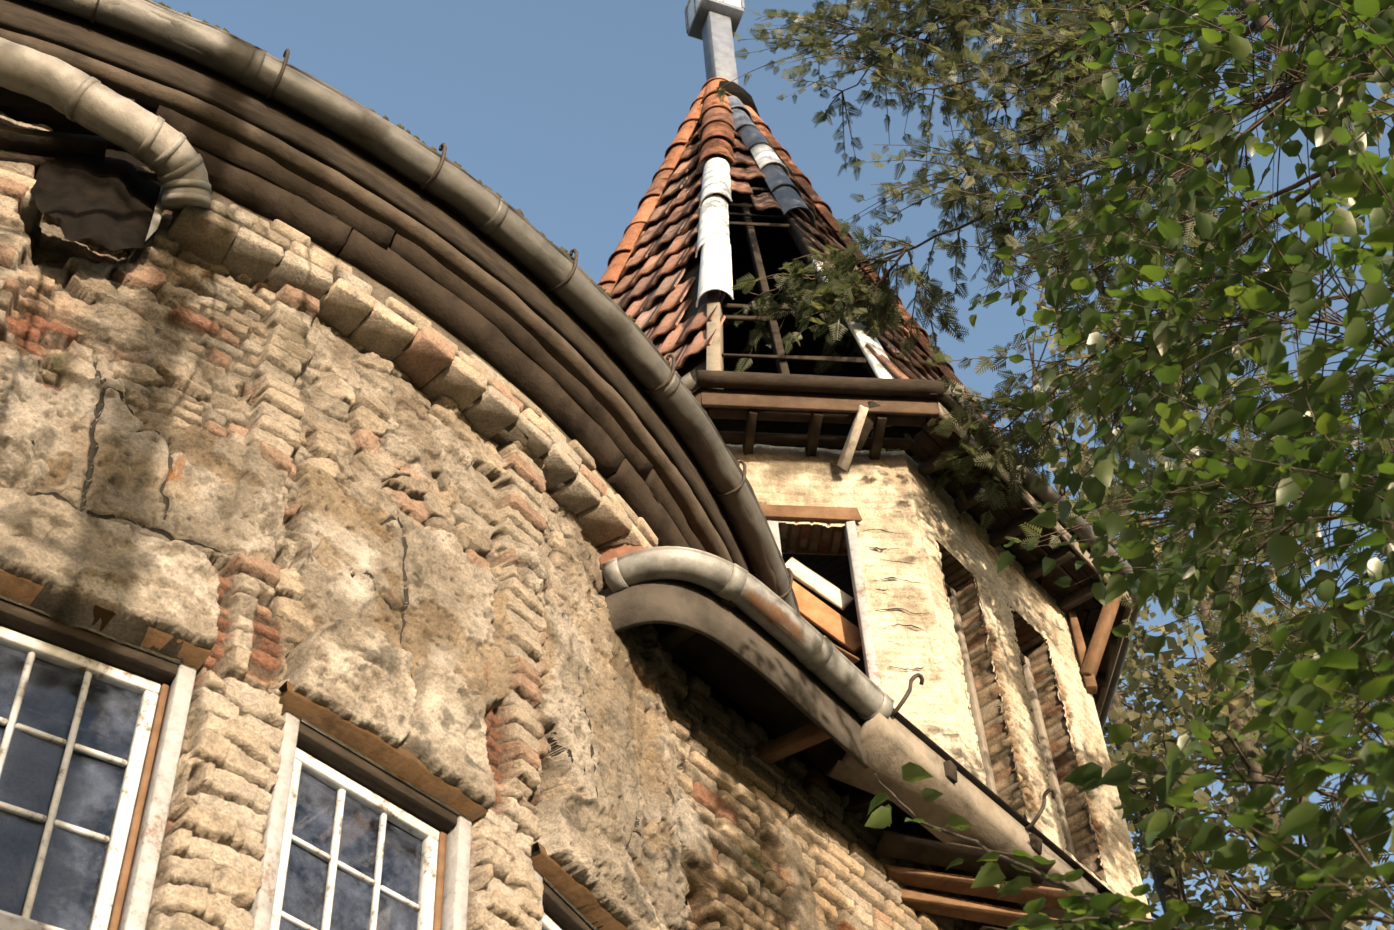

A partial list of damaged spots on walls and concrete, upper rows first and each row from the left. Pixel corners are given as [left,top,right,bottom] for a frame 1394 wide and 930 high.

spalling [0,200,276,446]
crack [33,362,234,555]
spalling [201,556,291,697]
crack [349,516,412,678]
spalling [484,695,523,820]
spalling [539,747,573,803]
spalling [979,612,1043,815]
spalling [681,865,718,930]